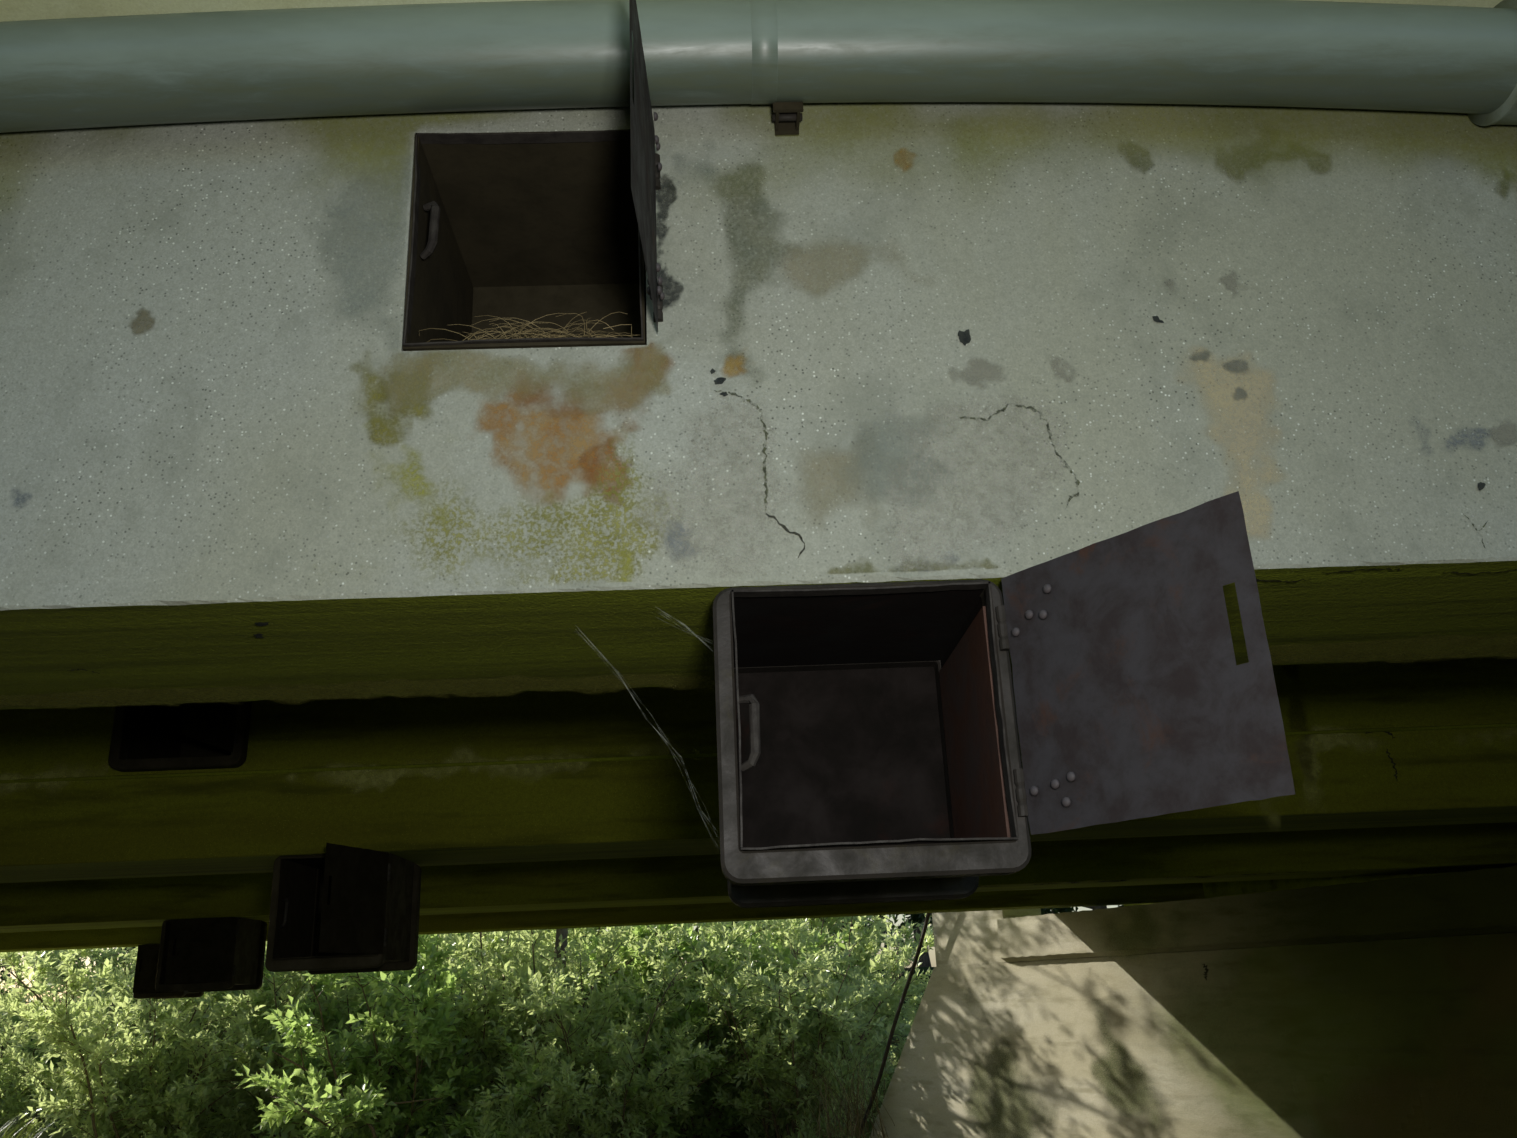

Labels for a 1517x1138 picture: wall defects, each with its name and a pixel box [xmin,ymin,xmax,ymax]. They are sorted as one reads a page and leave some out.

corrosion [481,387,628,498]
crack [714,390,805,558]
crack [960,404,1080,505]